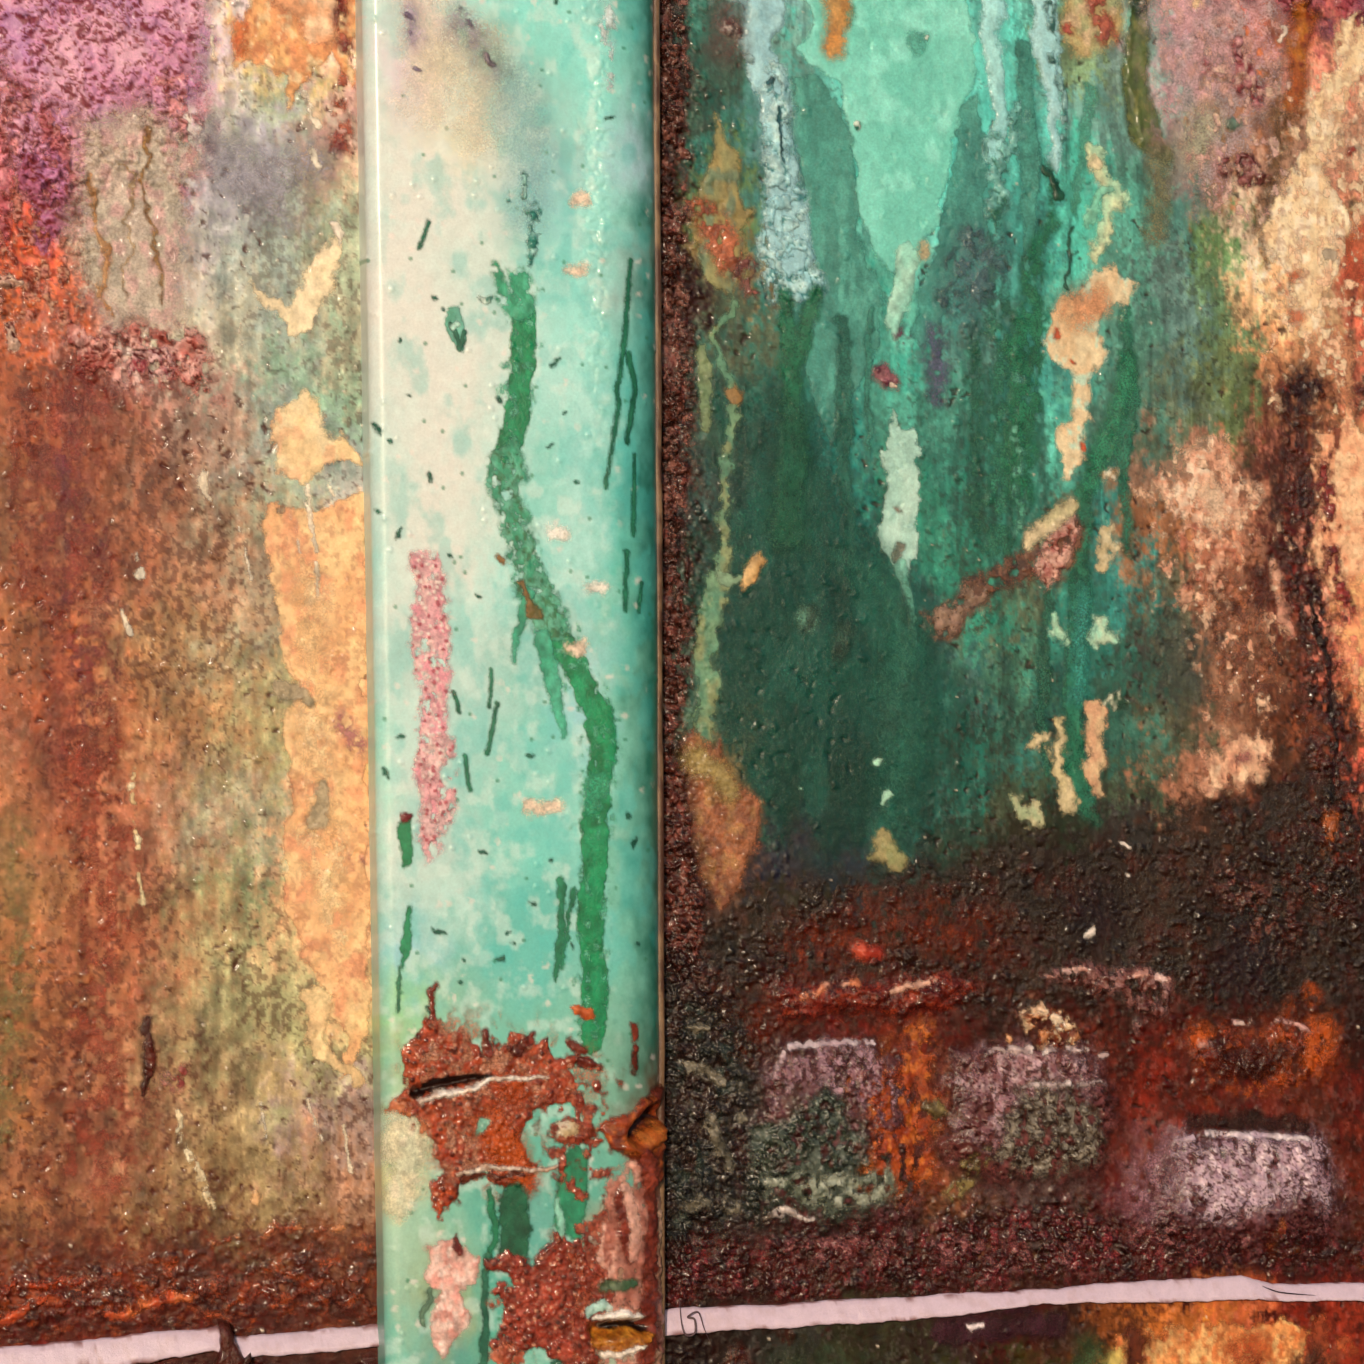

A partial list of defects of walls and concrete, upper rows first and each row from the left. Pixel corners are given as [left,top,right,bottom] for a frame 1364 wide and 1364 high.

peeling [1045,143,1134,480]
corrosion [660,0,1364,1105]
corrosion [10,320,226,1196]
peeling [380,1098,431,1222]
corrosion [0,1220,377,1364]
peeling [419,1234,480,1359]
peeling [585,1149,665,1364]
corrosion [665,1205,707,1308]
corrosion [721,1344,751,1364]
corrosion [1291,1345,1326,1364]